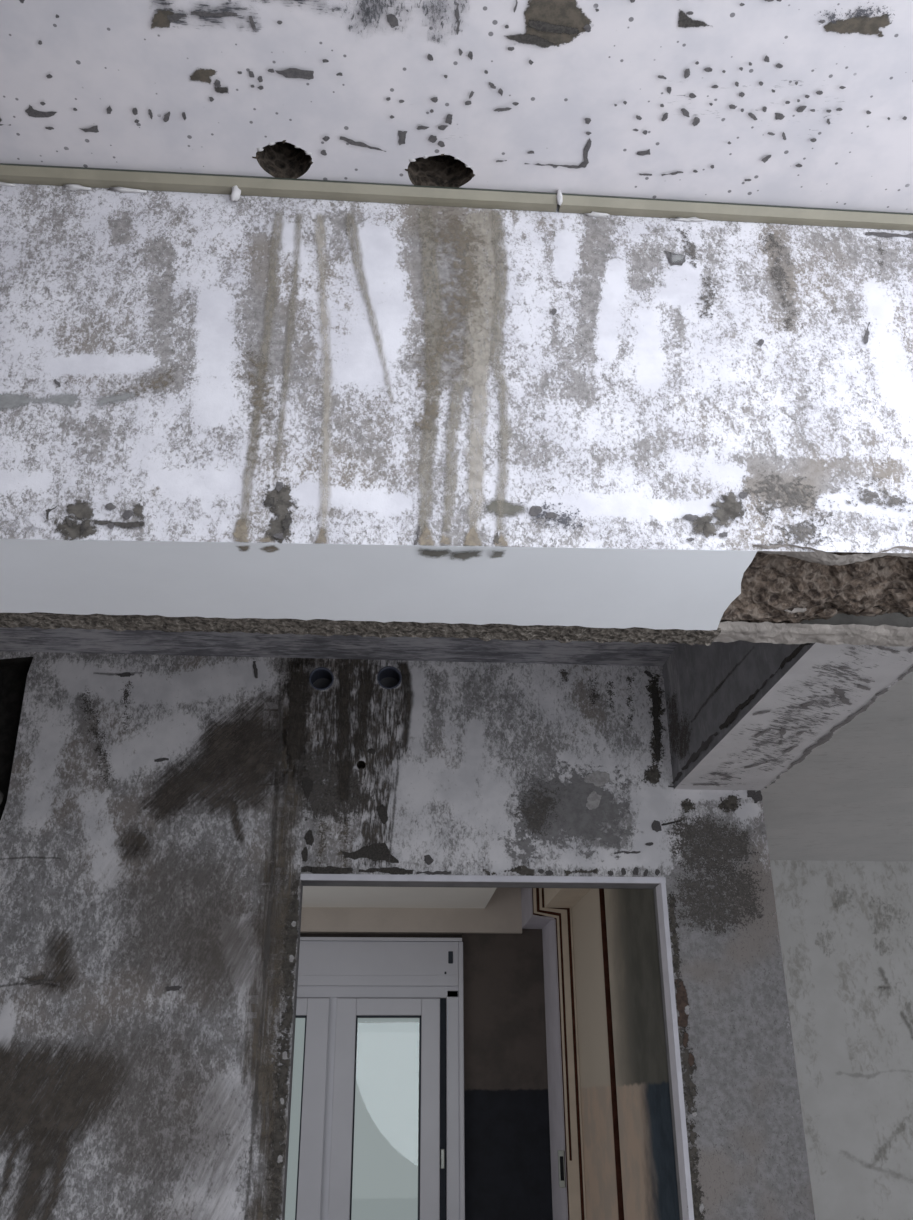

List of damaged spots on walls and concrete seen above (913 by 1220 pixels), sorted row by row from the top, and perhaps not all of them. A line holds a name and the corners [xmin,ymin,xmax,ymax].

peeling [237,59,343,90]
peeling [386,97,475,178]
peeling [505,0,599,51]
peeling [678,10,709,28]
peeling [819,6,895,37]
damp [233,214,302,552]
damp [315,215,331,544]
damp [347,207,585,560]
spalling [0,468,913,1220]
damp [26,931,74,991]
damp [120,658,413,1220]
damp [0,1040,124,1220]